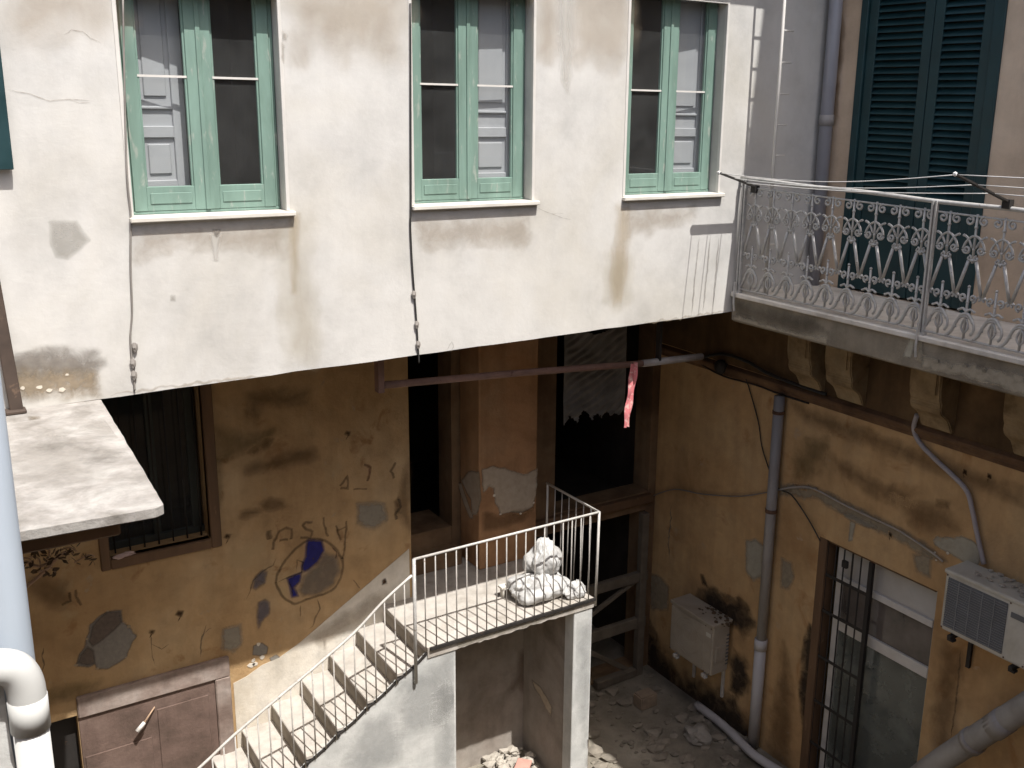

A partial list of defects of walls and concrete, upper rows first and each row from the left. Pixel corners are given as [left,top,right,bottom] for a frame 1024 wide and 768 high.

damp [15,350,100,397]
peeling [459,466,537,518]
damp [701,575,753,631]
peeling [74,610,154,670]